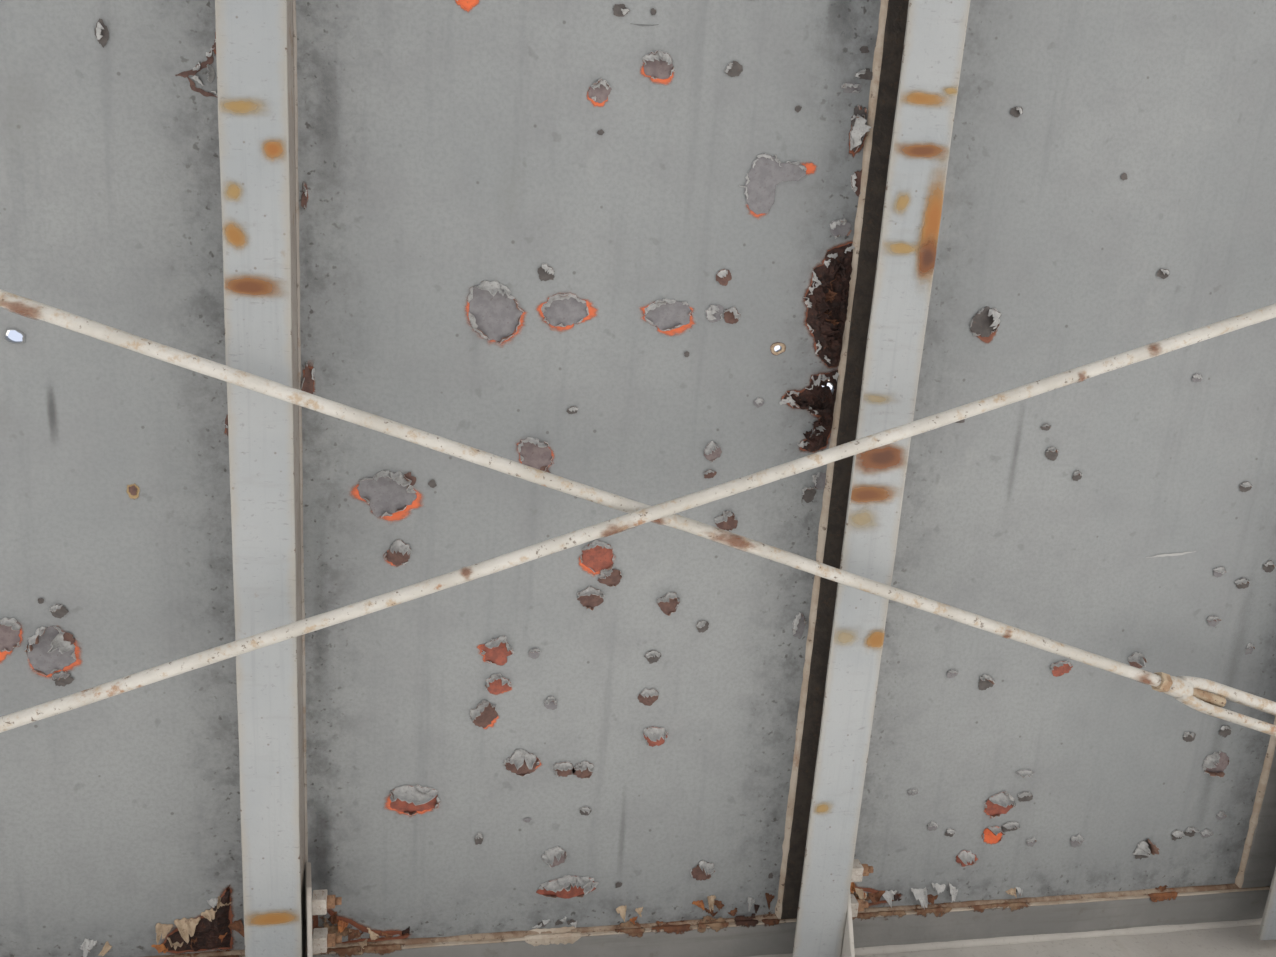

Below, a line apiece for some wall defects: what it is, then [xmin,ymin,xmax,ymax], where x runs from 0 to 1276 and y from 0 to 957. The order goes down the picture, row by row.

peeling [455,0,479,12]
corrosion [889,183,944,275]
corrosion [225,276,277,296]
peeling [465,280,597,344]
corrosion [779,241,855,453]
peeling [351,470,437,521]
peeling [0,598,81,687]
peeling [385,784,440,816]
peeling [982,769,1037,847]
corrosion [151,885,296,957]
corrosion [615,893,780,938]
corrosion [850,882,958,921]